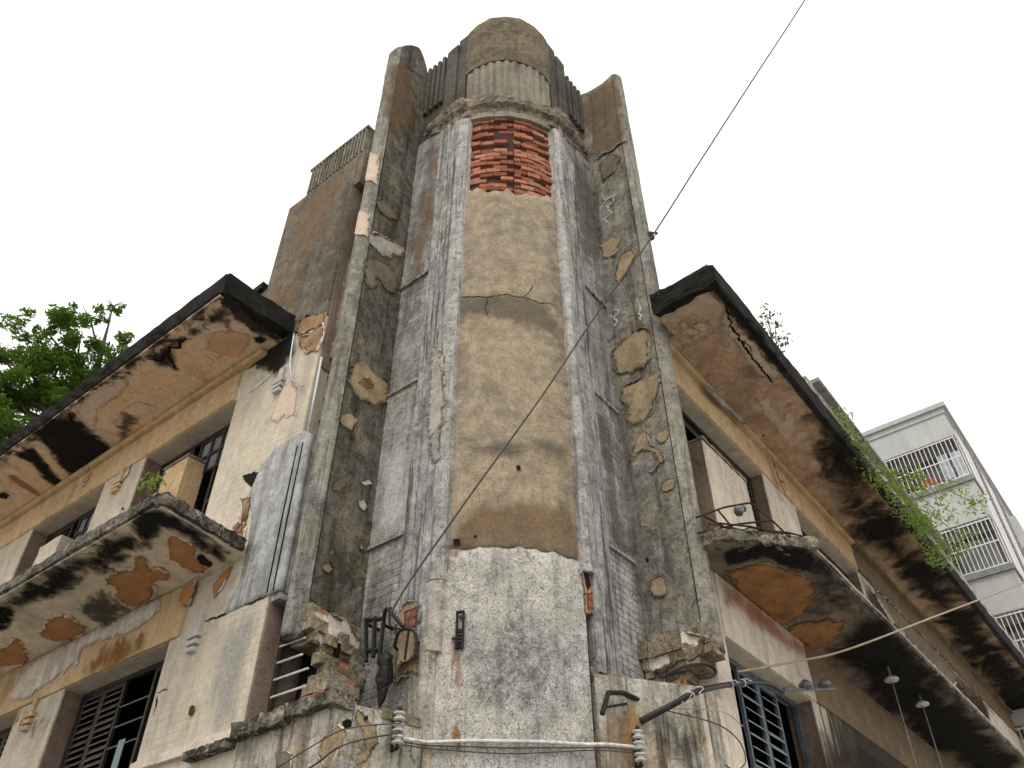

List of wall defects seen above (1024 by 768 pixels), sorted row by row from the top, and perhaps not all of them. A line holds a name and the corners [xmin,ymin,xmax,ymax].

leakage [0,290,296,486]
spalling [346,359,390,406]
crack [462,285,560,315]
spalling [610,298,669,463]
crack [725,305,774,383]
leakage [0,509,230,630]
peeling [0,533,233,701]
spalling [312,611,360,662]
spalling [578,566,596,615]
leakage [818,705,907,768]
leakage [805,414,1024,711]
leakage [832,589,1018,768]